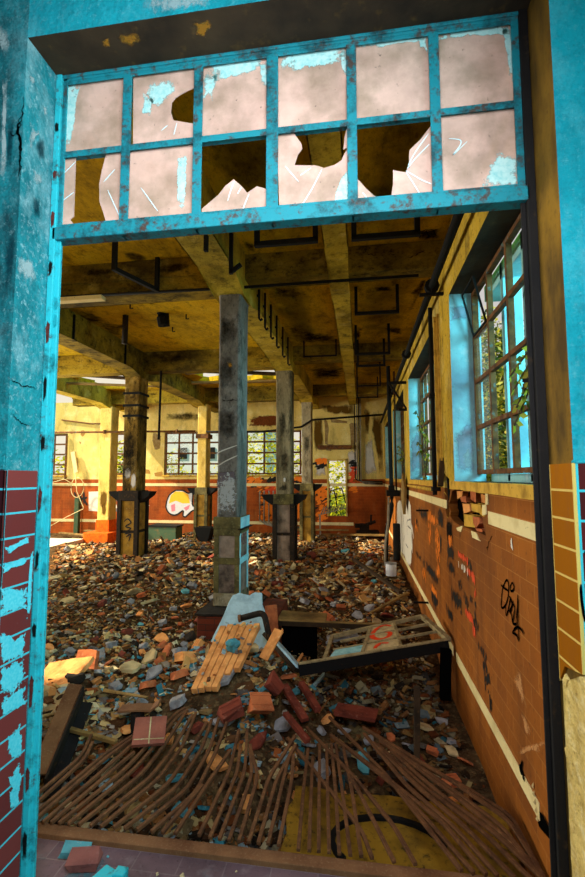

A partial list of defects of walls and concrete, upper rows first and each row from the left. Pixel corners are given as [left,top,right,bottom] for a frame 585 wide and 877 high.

crack [10,97,24,176]
peeling [45,297,57,343]
spalling [456,491,489,541]
peeling [35,552,46,599]